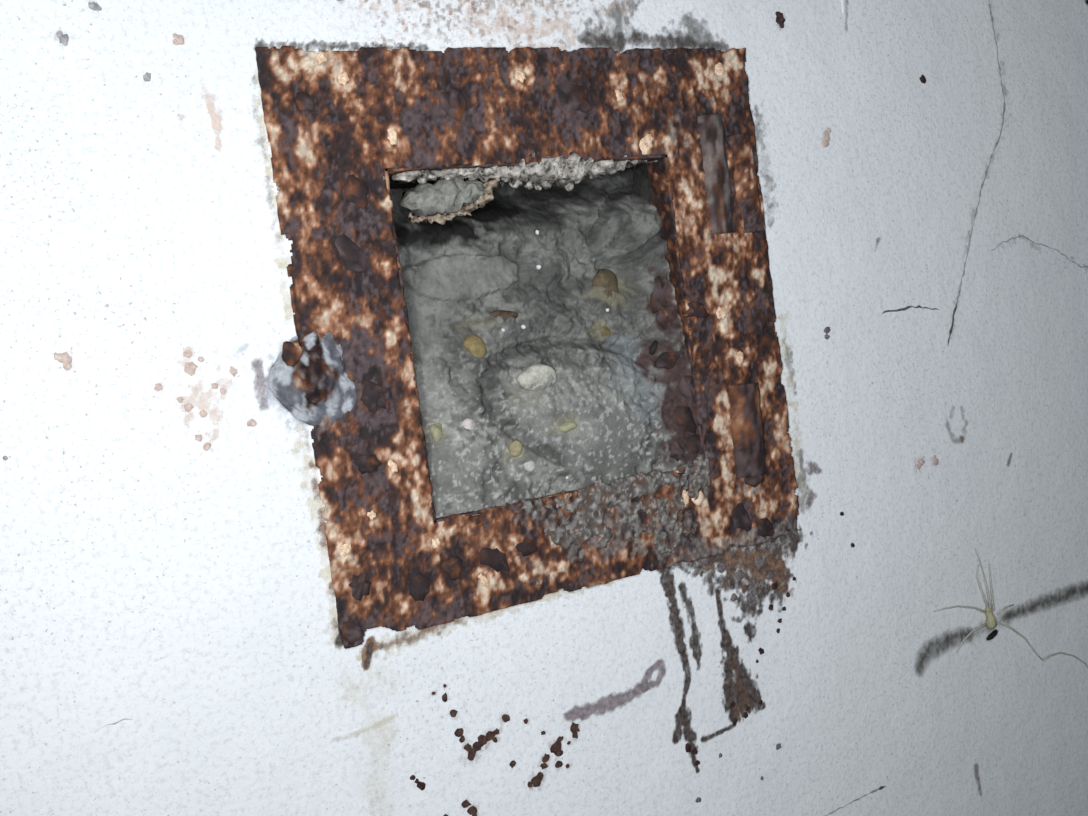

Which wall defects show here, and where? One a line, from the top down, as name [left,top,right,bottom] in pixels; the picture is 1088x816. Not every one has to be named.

corrosion [255,41,428,51]
crack [882,1,1088,345]
corrosion [793,428,822,511]
corrosion [302,482,327,548]
corrosion [330,611,342,646]
corrosion [358,619,459,670]
corrosion [657,529,812,773]